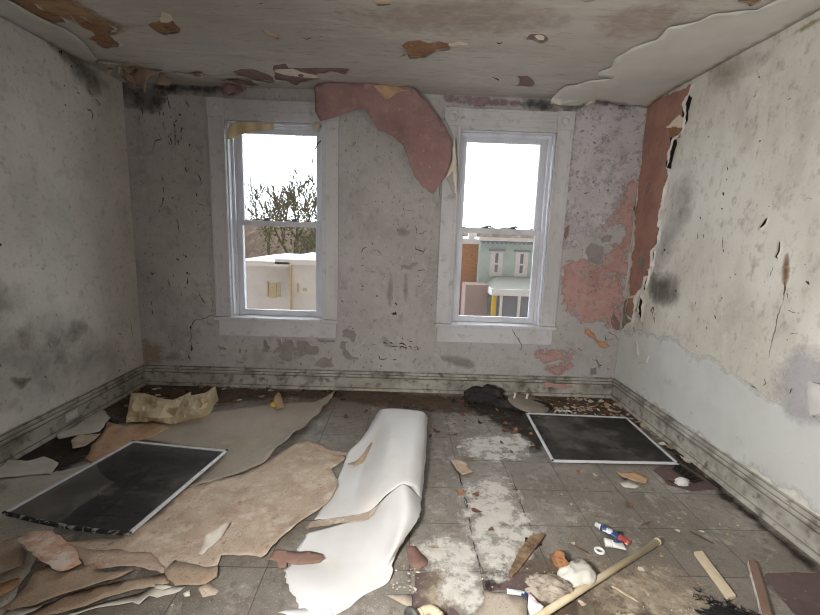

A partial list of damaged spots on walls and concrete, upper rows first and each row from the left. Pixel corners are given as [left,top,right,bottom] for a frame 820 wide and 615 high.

peeling [20,3,125,49]
peeling [142,12,186,36]
peeling [397,38,468,59]
peeling [523,32,552,44]
peeling [228,62,353,86]
peeling [513,74,539,87]
peeling [609,79,696,364]